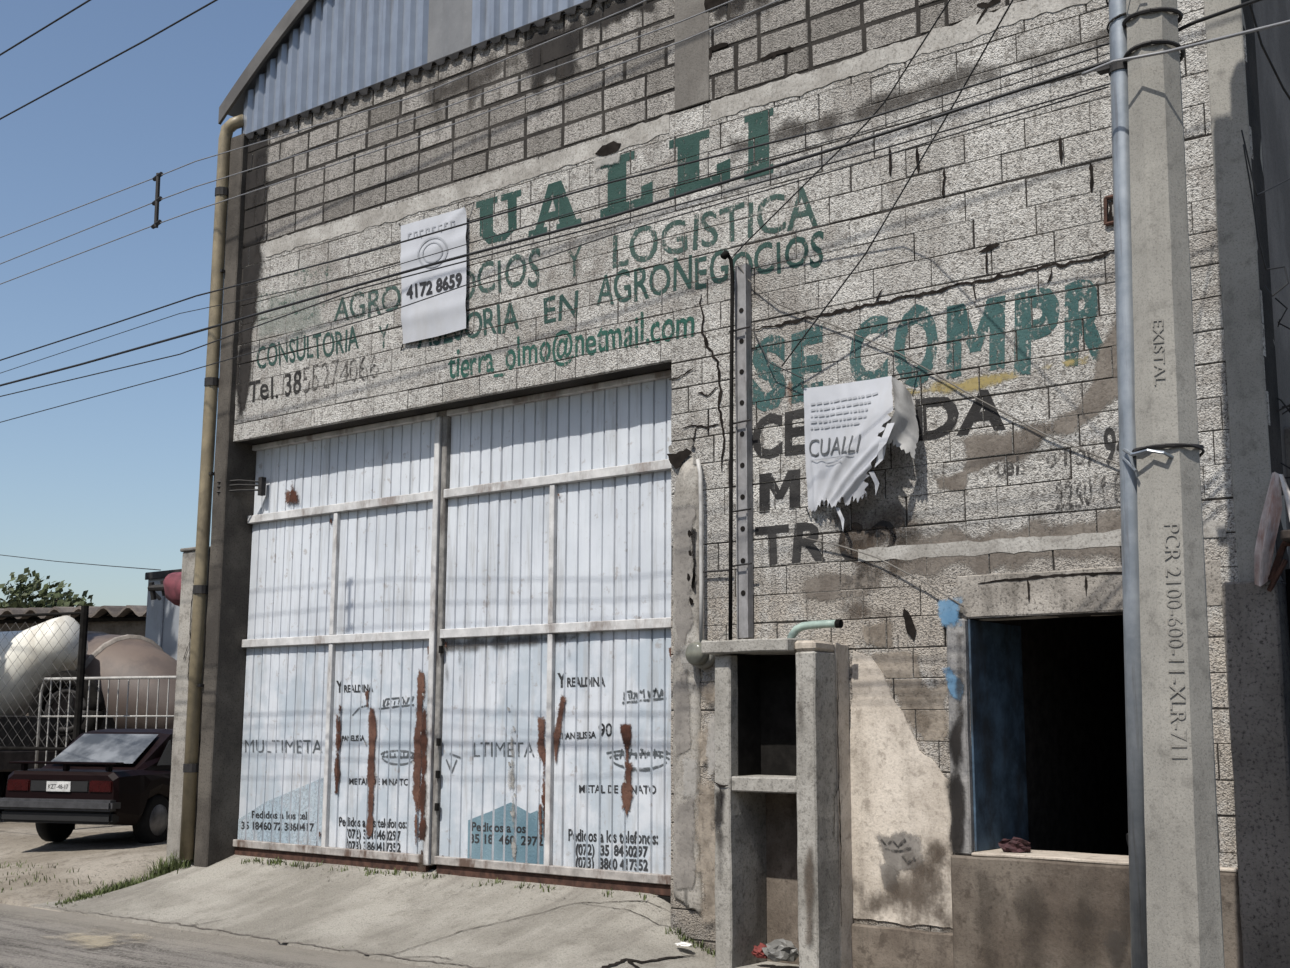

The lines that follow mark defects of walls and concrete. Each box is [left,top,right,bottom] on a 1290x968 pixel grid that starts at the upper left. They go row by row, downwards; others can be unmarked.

crack [669,297,725,471]
rust [364,691,377,837]
rust [412,669,425,855]
rust [537,695,566,844]
rust [620,724,633,816]